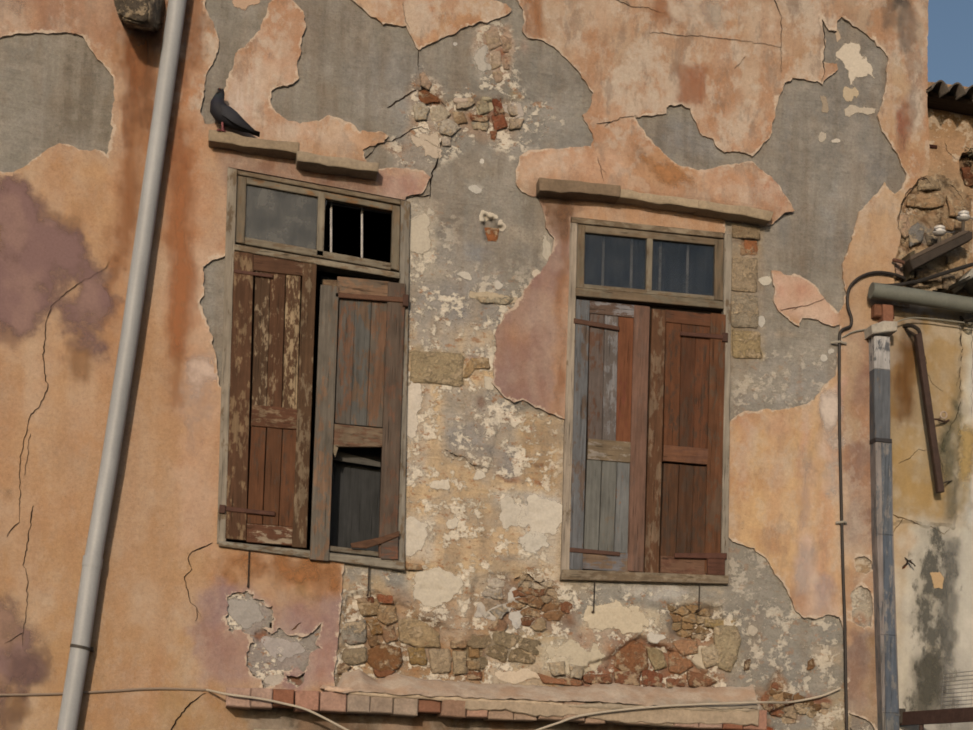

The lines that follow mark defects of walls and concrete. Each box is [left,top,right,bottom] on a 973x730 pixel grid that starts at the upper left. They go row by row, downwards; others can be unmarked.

flaking render [0,33,115,173]
flaking render [200,0,272,124]
spalling [959,147,973,188]
damp [0,175,113,376]
flaking render [200,257,225,387]
flaking render [270,0,906,730]
crack [6,268,106,643]
crack [184,543,211,621]
flaking render [226,591,321,688]
damp [909,527,957,711]
crack [171,693,205,730]